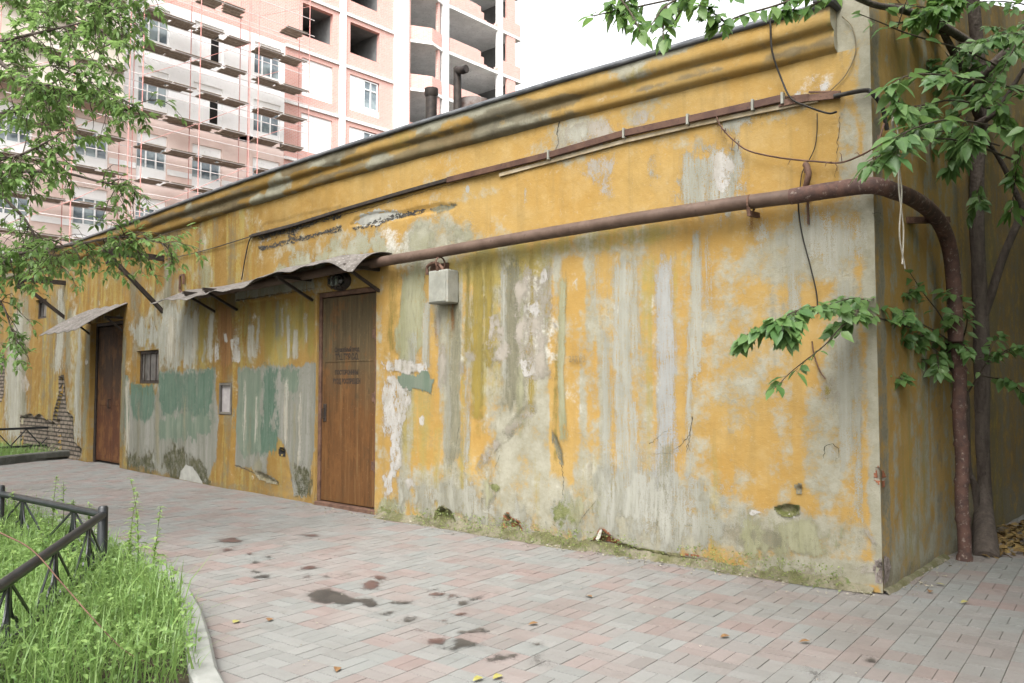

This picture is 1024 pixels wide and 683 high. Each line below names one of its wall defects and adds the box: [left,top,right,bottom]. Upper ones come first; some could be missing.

leakage [671,133,748,204]
flaking render [257,203,456,251]
flaking render [20,375,82,460]
leakage [116,259,216,464]
peeling [381,261,557,511]
leakage [235,196,872,565]
crack [649,417,693,454]
flaking render [749,483,802,518]
leakage [215,537,275,578]